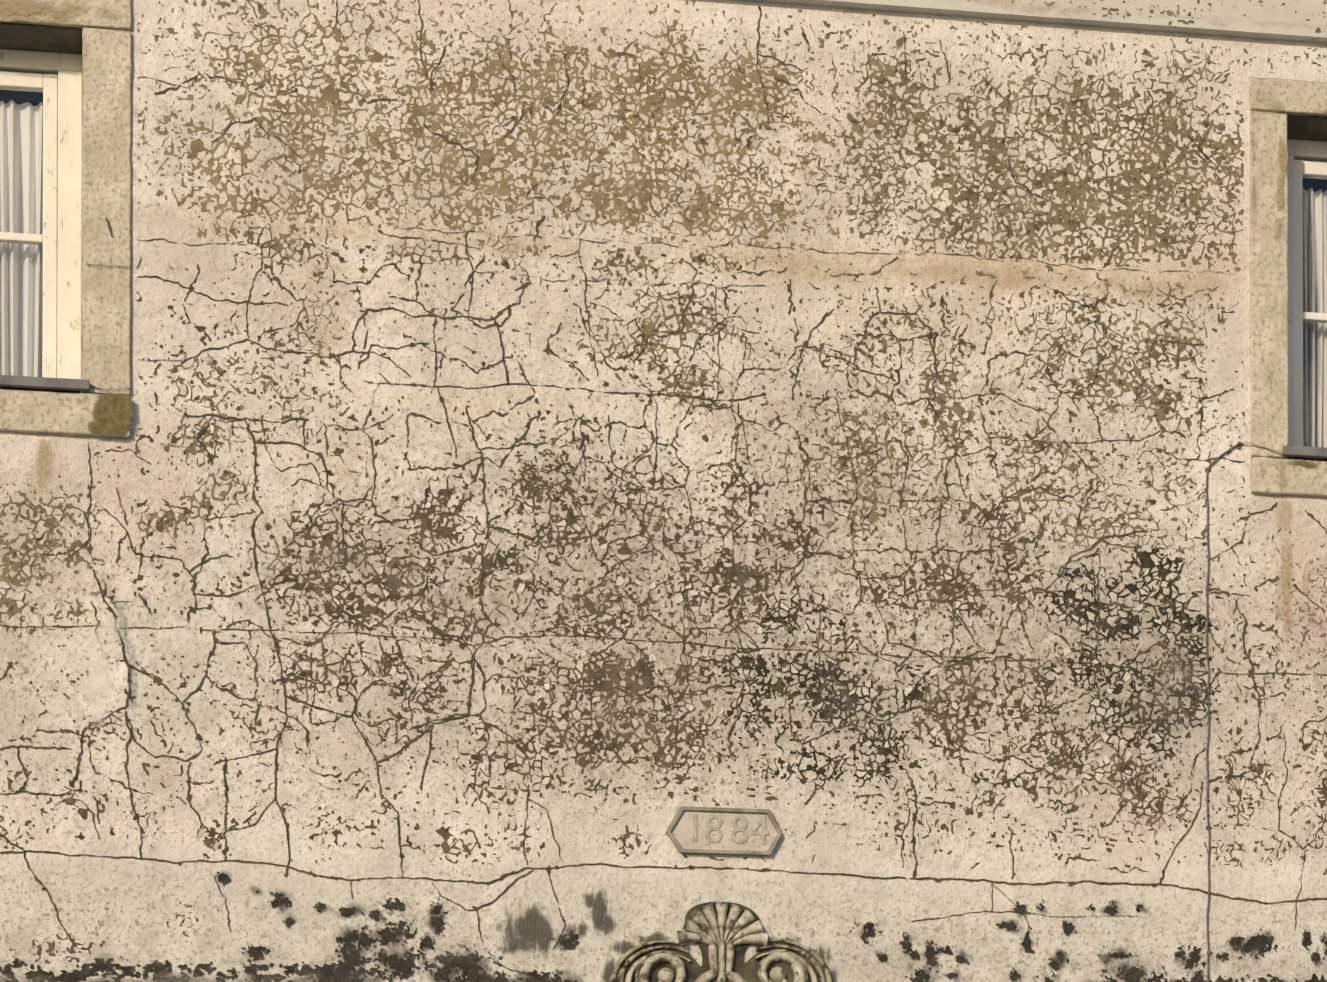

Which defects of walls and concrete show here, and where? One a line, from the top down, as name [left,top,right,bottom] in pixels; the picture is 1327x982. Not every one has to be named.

crack [202,0,257,43]
crack [418,0,428,76]
crack [756,6,804,110]
crack [0,218,1327,974]
peeling [115,655,195,753]
peeling [0,706,229,849]
peeling [1254,676,1327,871]
peeling [187,802,257,859]
water stain [0,896,583,982]
water stain [899,932,970,982]
water stain [996,899,1077,982]
water stain [1098,928,1327,982]